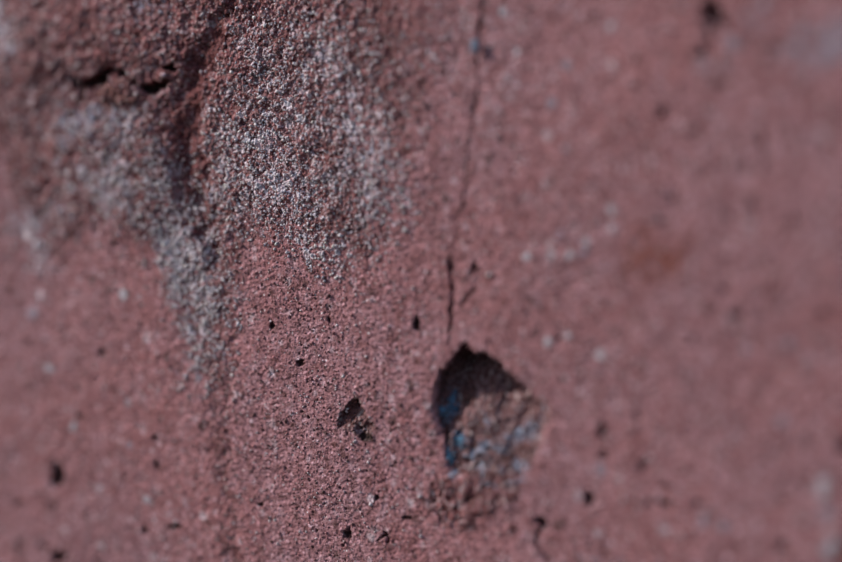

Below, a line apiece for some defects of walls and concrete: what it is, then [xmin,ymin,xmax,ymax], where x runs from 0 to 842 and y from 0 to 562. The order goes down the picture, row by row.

crack [58,63,178,126]
crack [191,2,237,85]
damp [0,0,429,400]
crack [448,0,486,344]
spalling [337,396,375,442]
spalling [429,342,553,530]